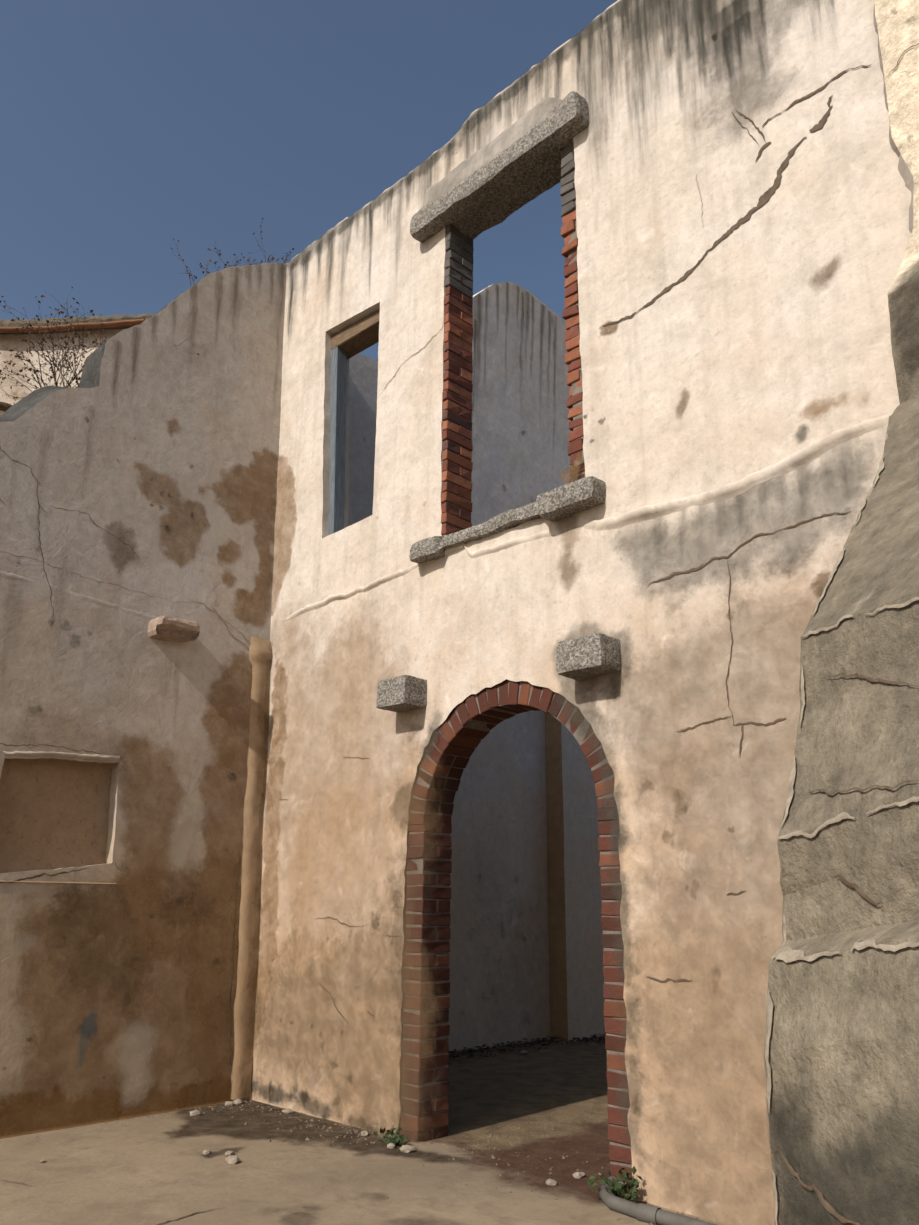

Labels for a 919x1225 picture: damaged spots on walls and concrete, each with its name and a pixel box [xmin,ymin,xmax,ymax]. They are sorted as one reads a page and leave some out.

water stain [557,28,584,67]
water stain [723,0,763,54]
crack [602,43,919,326]
crack [0,446,250,651]
water stain [136,452,294,624]
crack [650,510,852,758]
water stain [0,655,328,1139]